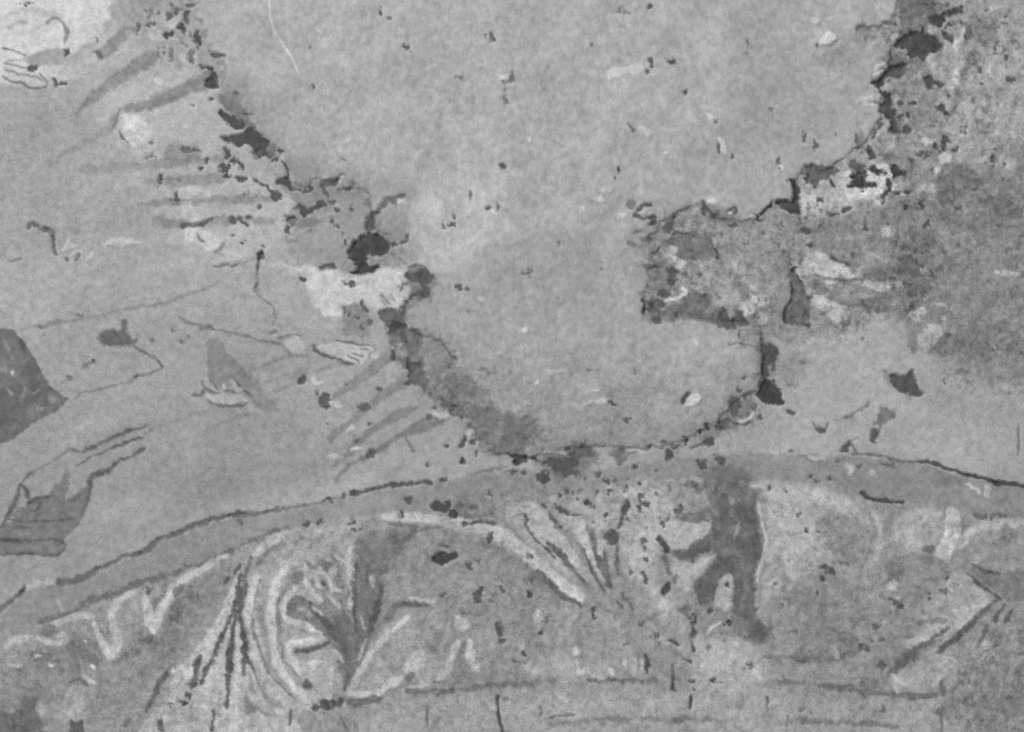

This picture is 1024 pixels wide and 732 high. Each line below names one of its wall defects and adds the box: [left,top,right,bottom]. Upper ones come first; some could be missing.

hole [481,30,498,43]
peeling [110,0,439,384]
hole [440,213,458,234]
hole [454,283,486,316]
flaking render [517,0,1024,588]
peeling [296,374,384,461]
flaking render [443,433,480,466]
flaking render [422,461,449,485]
crack [850,422,1024,522]
hole [816,559,858,598]